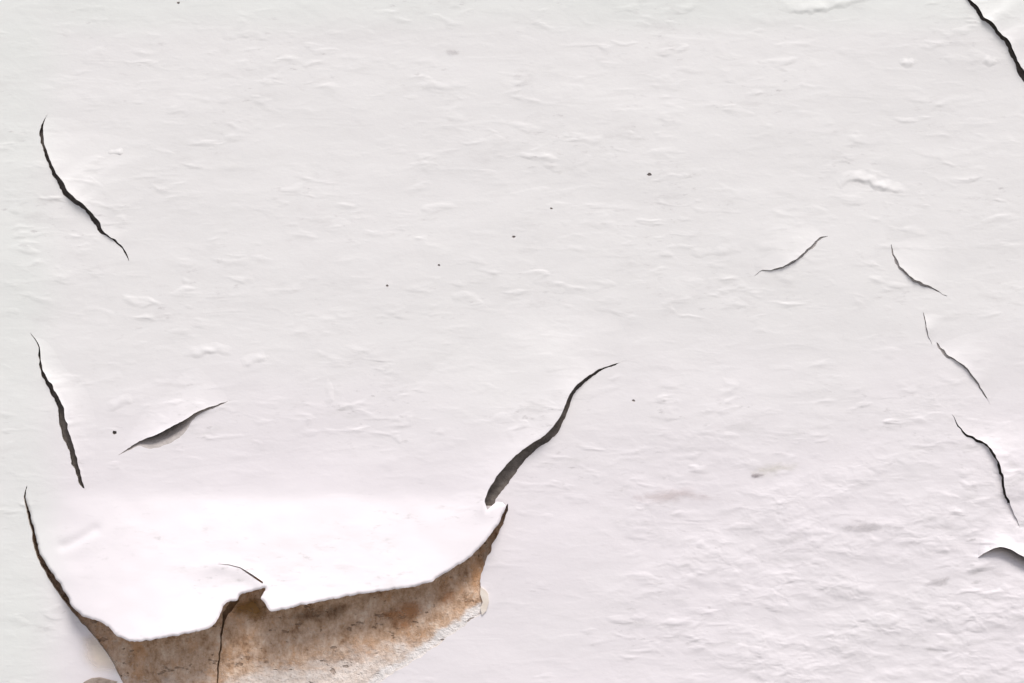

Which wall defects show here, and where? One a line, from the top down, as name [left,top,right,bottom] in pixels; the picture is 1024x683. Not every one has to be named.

crack [968,0,1024,82]
crack [39,114,155,260]
crack [754,213,827,275]
crack [34,337,96,491]
peeling [25,291,627,683]
crack [485,362,622,506]
crack [891,235,1024,528]